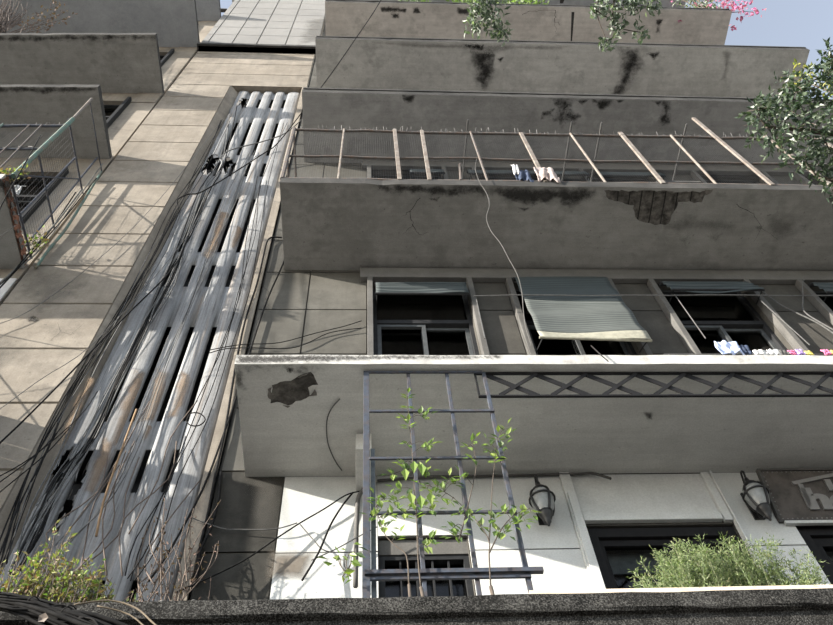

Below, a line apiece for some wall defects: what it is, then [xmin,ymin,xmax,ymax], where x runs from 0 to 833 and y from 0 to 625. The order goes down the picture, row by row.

water stain [543,51,638,122]
spalling [604,189,713,225]
spalling [267,372,318,408]